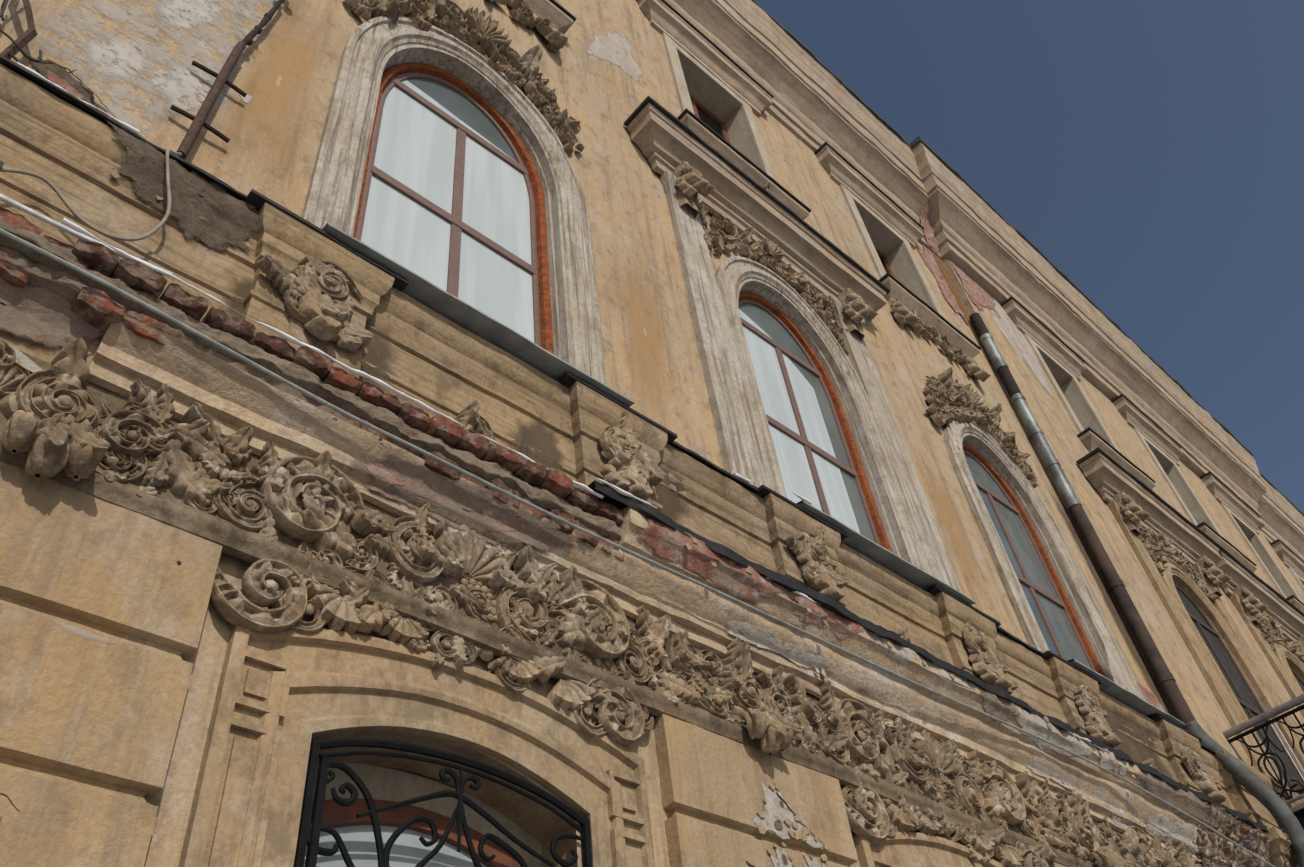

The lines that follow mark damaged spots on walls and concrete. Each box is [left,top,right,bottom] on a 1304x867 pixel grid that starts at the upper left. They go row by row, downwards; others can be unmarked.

peeling [28,0,275,253]
flaking render [915,200,1030,368]
flaking render [0,207,624,561]
spalling [638,519,780,604]
spalling [726,620,831,678]
spalling [792,596,1299,867]
peeling [753,781,831,867]